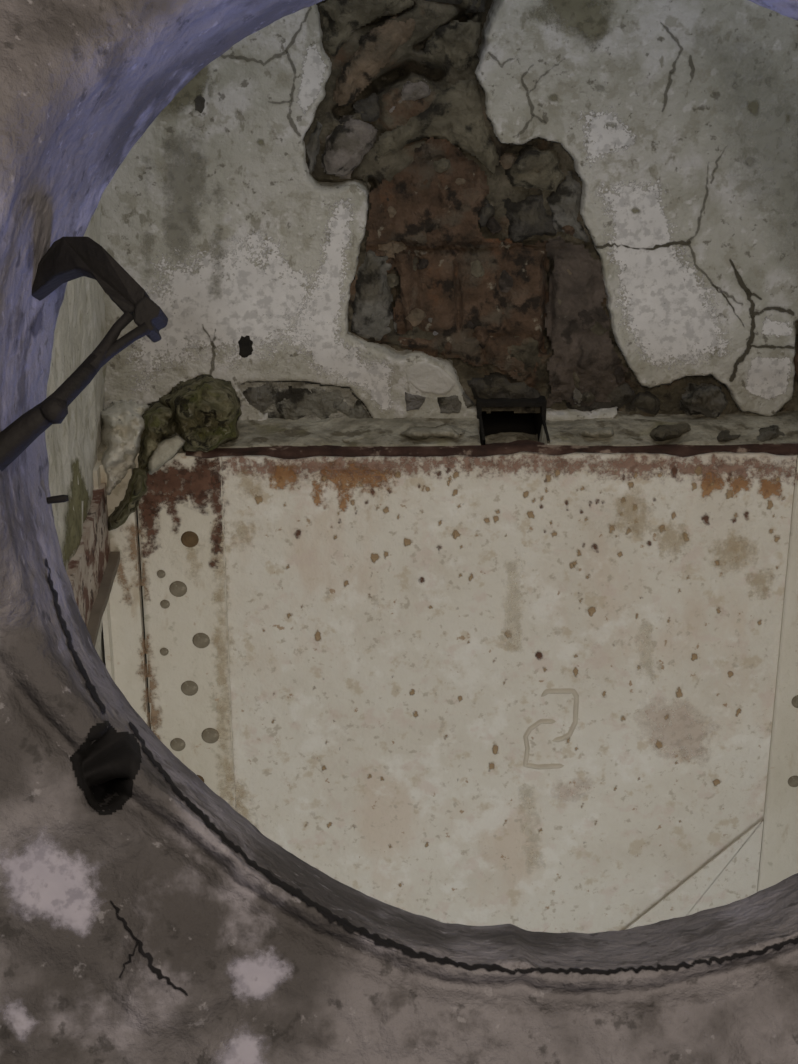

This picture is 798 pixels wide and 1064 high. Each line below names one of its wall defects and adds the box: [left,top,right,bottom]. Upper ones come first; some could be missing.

damp [161,67,209,112]
crack [221,6,312,136]
spalling [303,0,740,442]
crack [595,155,797,382]
spalling [239,381,371,421]
spalling [757,425,792,442]
spalling [779,320,798,412]
corrosion [117,454,798,604]
corrosion [138,635,162,740]